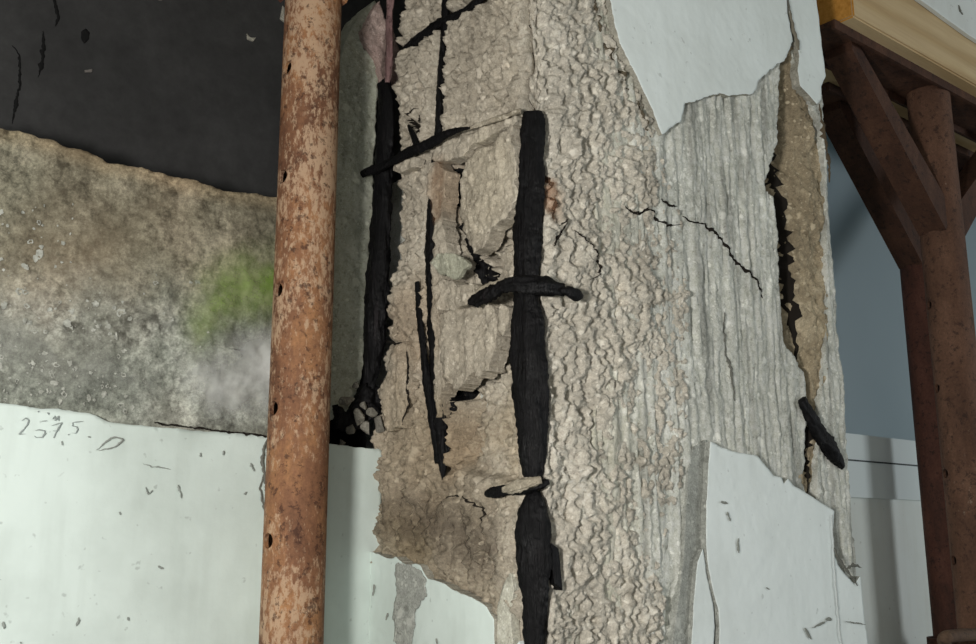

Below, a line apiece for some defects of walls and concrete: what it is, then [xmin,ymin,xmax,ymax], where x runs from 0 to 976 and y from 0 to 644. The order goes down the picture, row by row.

crack [12,0,60,123]
spalling [330,0,707,644]
crack [625,0,831,494]